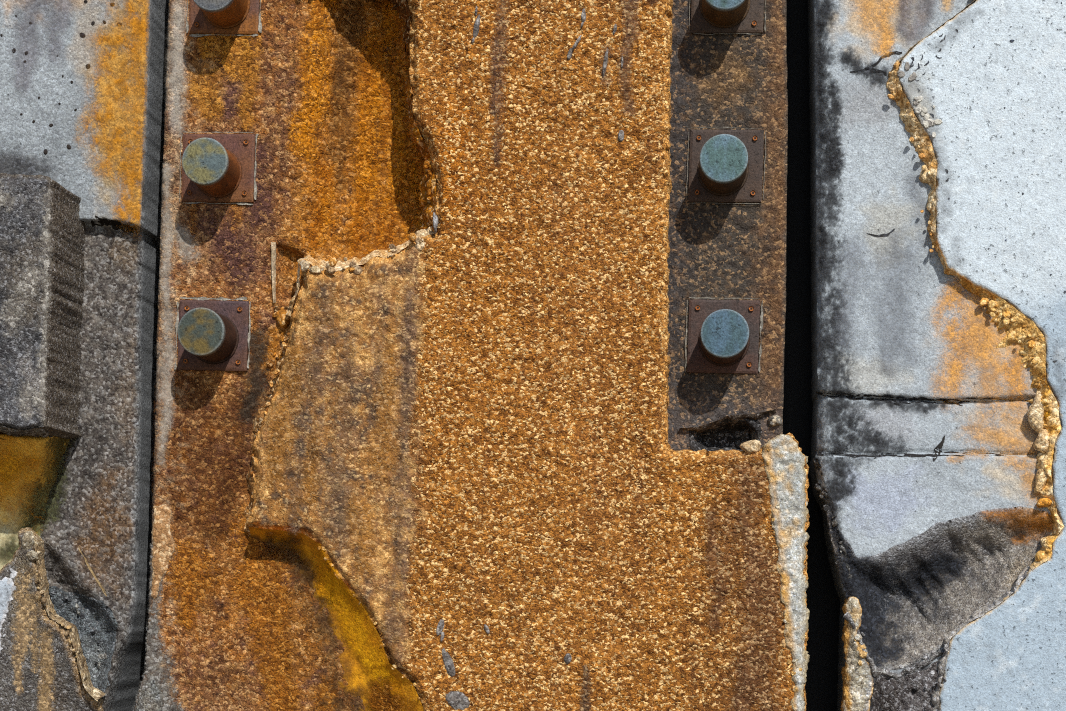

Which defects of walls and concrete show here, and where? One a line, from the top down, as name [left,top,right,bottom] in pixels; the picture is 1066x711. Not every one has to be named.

corrosion [85,0,148,229]
corrosion [187,34,261,130]
corrosion [290,0,427,259]
water stain [0,436,72,563]
spalling [0,425,118,701]
corrosion [167,515,300,711]
spalling [242,0,438,711]
corrosion [314,550,415,711]
spalling [679,0,1064,711]
water stain [815,0,965,711]
crack [816,391,1029,406]
crack [818,435,1033,461]